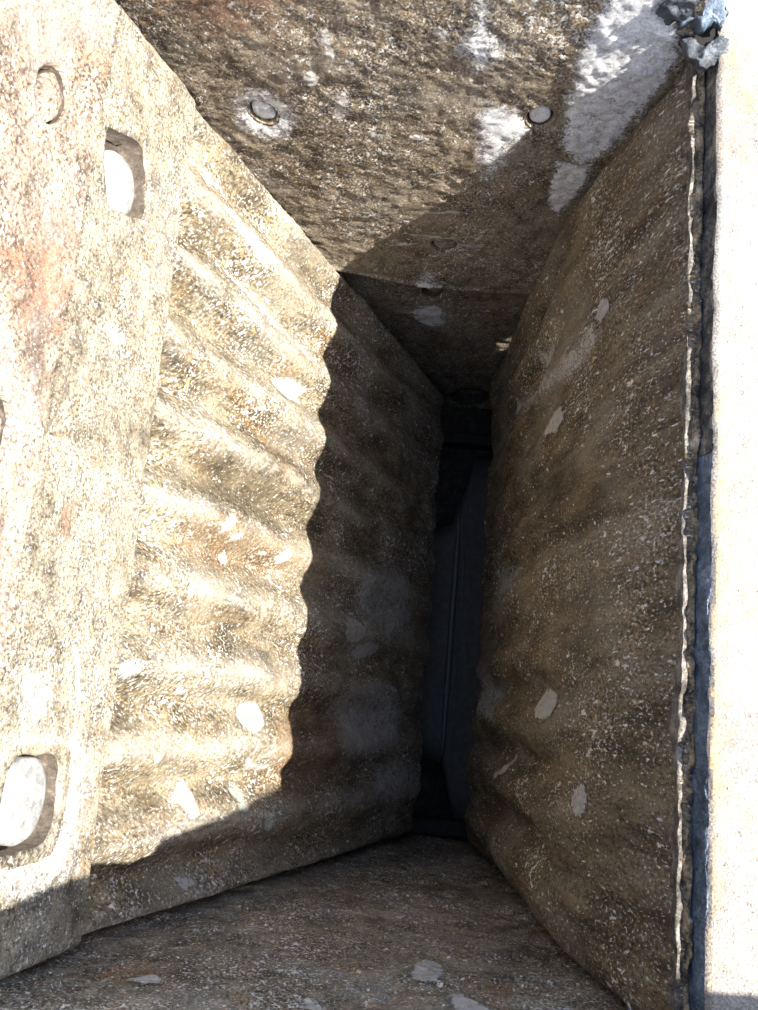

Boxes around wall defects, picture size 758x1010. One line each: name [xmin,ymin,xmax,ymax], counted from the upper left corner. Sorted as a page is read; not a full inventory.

water stain [475,106,530,181]
peeling [547,0,682,212]